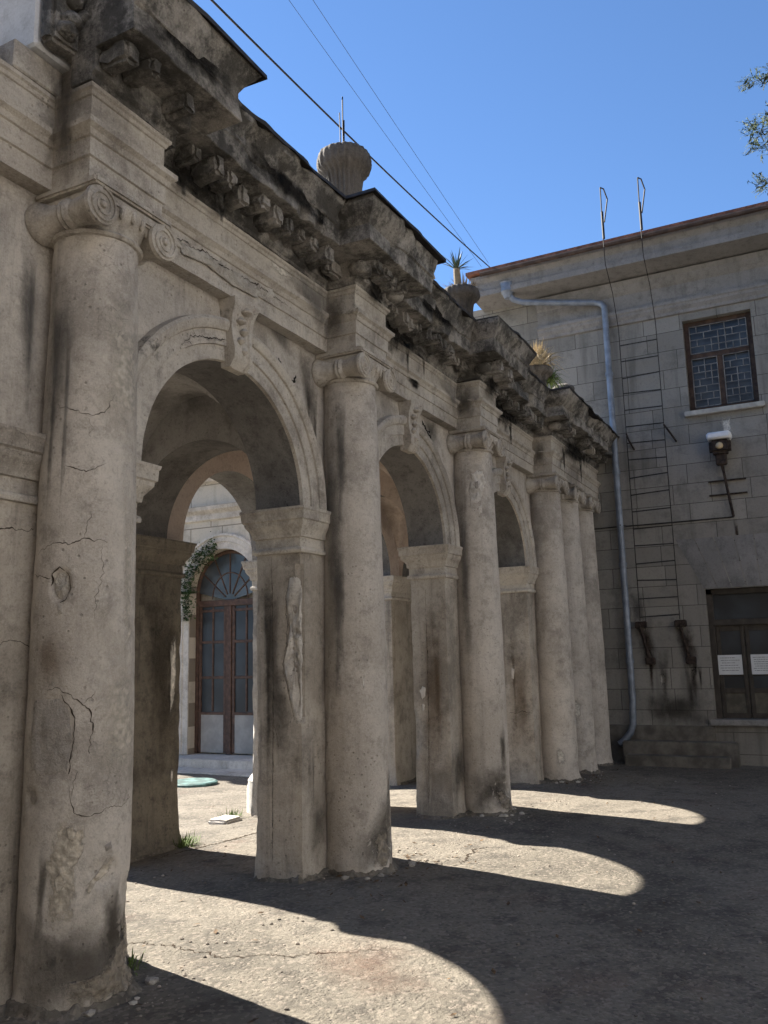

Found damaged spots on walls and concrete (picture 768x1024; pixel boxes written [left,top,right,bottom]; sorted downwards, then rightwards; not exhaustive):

crack [178,238,283,303]
crack [58,394,116,437]
crack [0,516,104,617]
spalling [282,570,303,722]
crack [49,687,130,817]